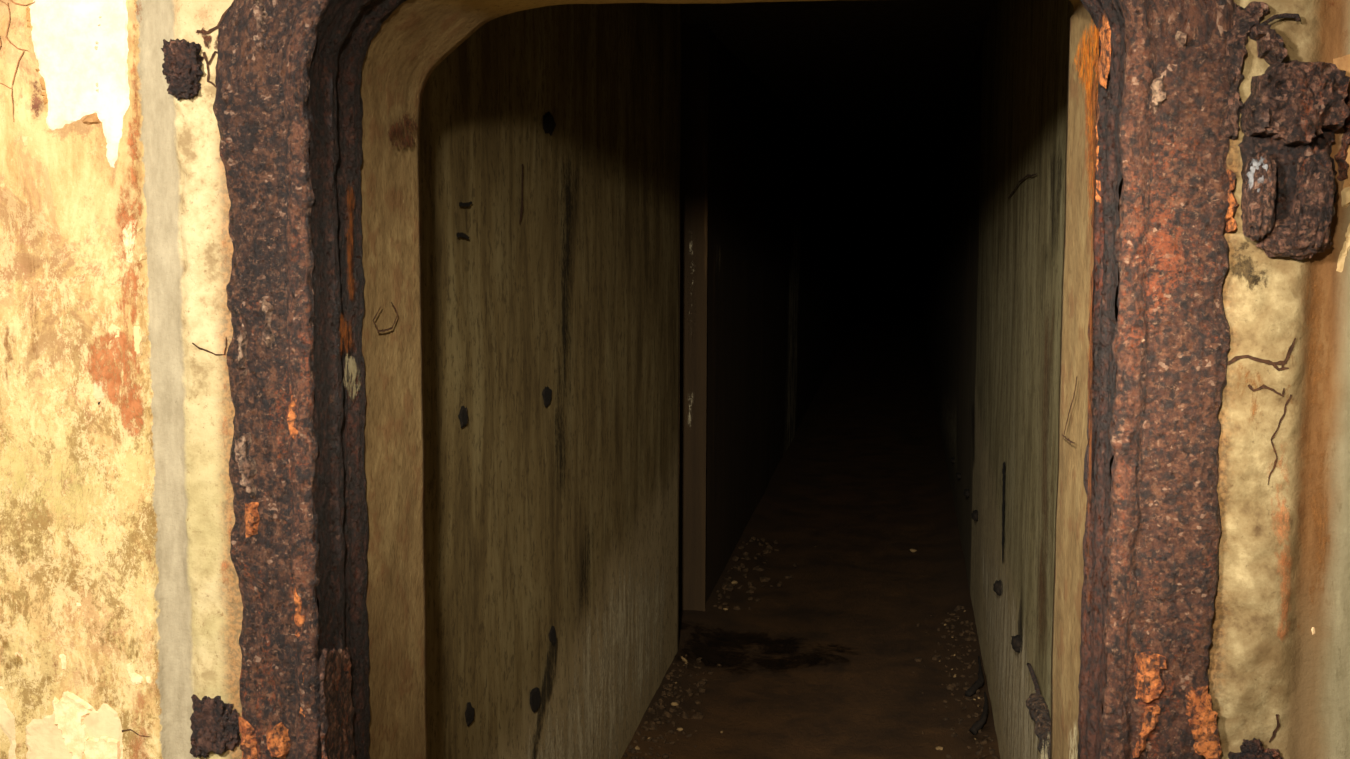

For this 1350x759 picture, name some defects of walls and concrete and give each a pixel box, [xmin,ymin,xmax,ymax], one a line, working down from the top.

crack [0,0,34,122]
flaking render [26,0,130,168]
flaking render [1333,54,1350,94]
rust [84,56,144,436]
rust [346,186,355,298]
rust [1074,17,1100,554]
flaking render [1336,129,1350,272]
rust [1036,312,1054,655]
crack [1228,338,1296,484]
flaking render [0,686,124,759]